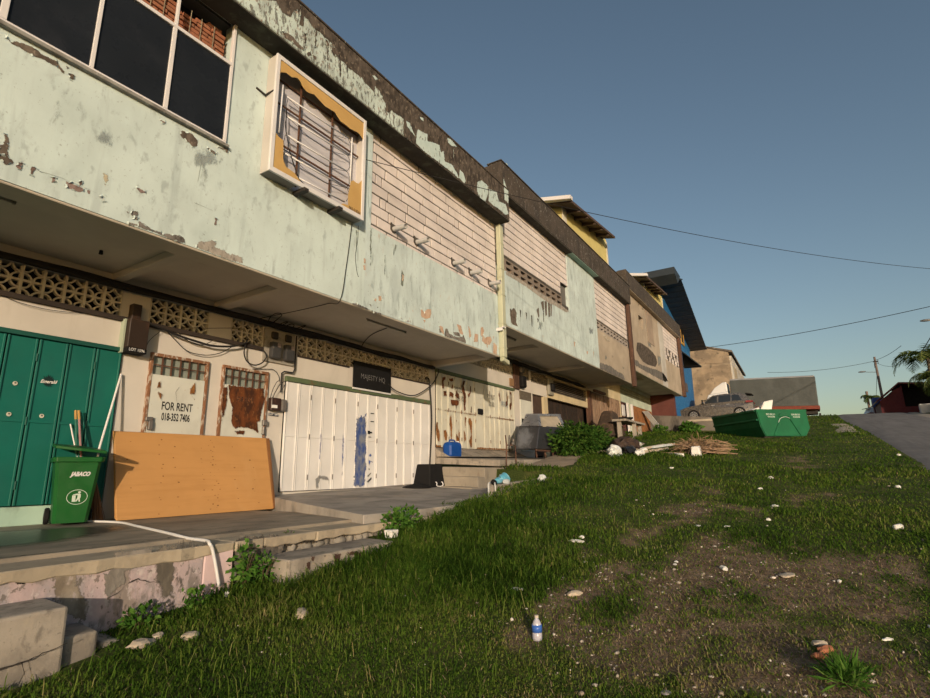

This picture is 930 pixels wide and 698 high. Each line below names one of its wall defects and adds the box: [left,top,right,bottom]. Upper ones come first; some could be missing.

peeling [5,35,75,81]
peeling [282,27,348,77]
peeling [0,132,39,177]
peeling [180,131,229,155]
peeling [406,117,466,183]
peeling [477,181,509,215]
spalling [127,210,243,263]
spalling [505,271,569,318]
spalling [439,324,497,354]
rust [222,385,265,434]
spalling [52,575,89,621]
peeling [103,566,144,599]